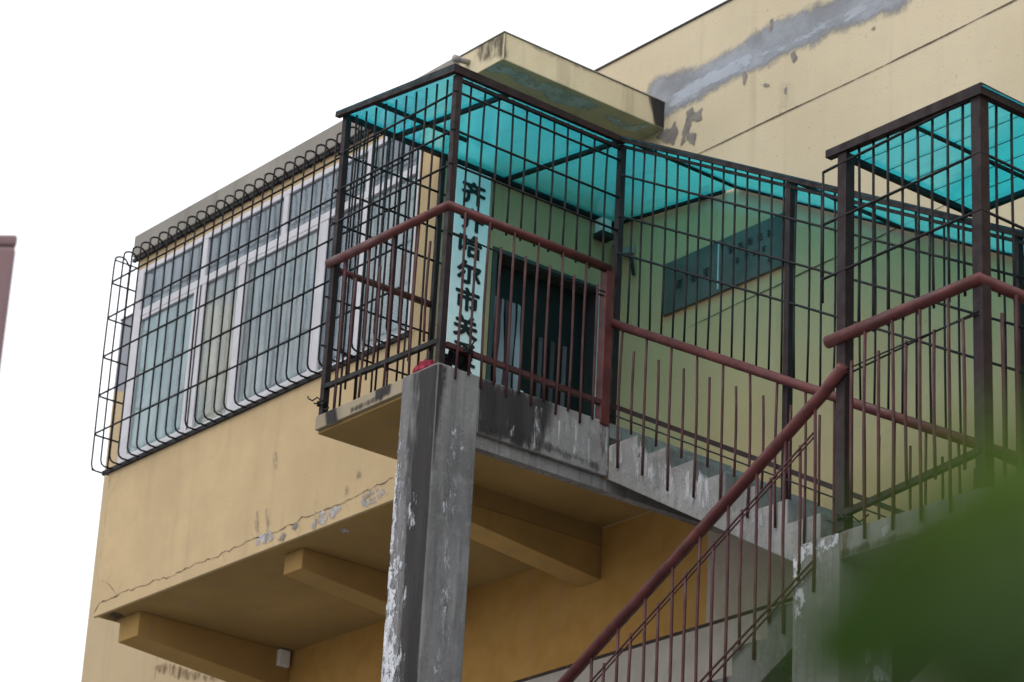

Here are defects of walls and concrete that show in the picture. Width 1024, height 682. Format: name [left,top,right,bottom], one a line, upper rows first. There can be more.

peeling [656,107,703,146]
damp [478,379,608,471]
crack [93,478,390,614]
peeling [355,430,415,682]
peeling [433,427,463,682]